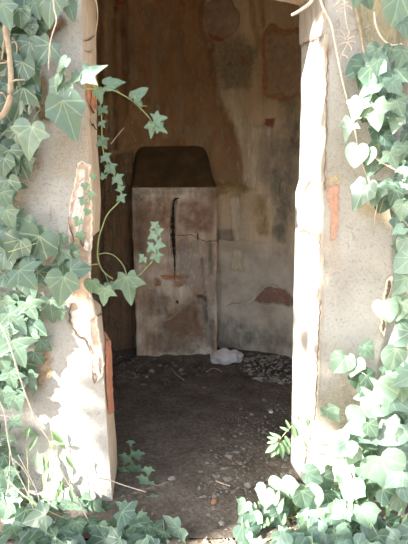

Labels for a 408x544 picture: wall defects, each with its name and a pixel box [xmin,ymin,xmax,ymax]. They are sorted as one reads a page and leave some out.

spalling [86,84,97,111]
spalling [323,47,339,240]
crack [170,198,217,280]
spalling [67,161,114,414]
spalling [228,284,294,306]
spalling [382,276,393,302]